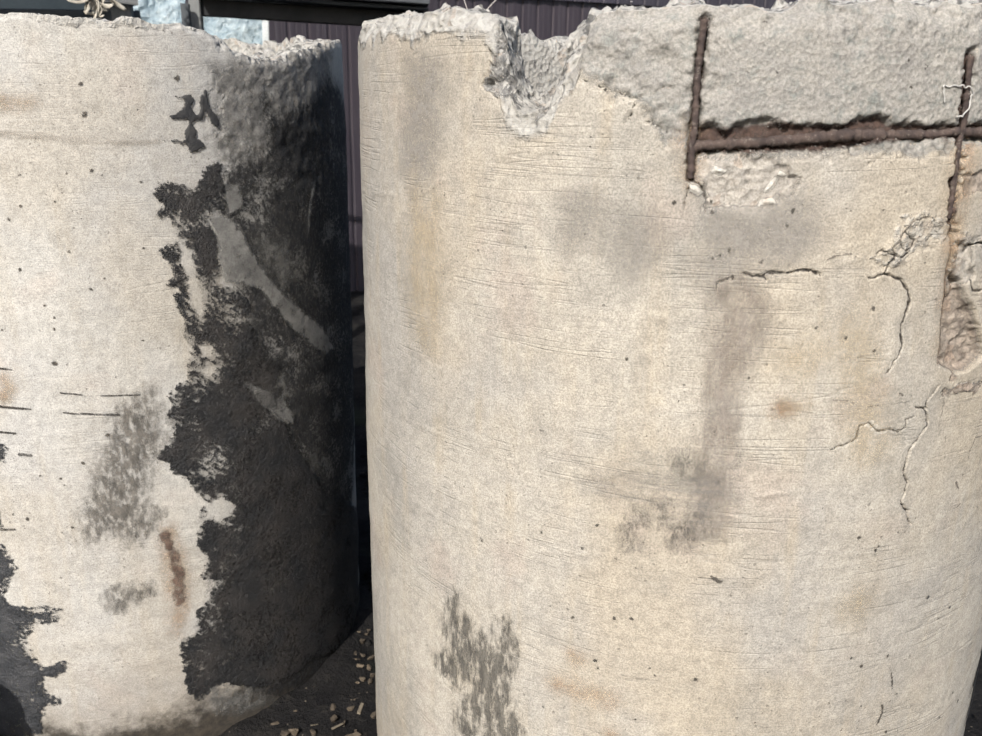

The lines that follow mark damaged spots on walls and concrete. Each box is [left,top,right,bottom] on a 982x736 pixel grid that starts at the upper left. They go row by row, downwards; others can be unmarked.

spalling [486,22,517,97]
spalling [579,0,982,214]
crack [716,253,852,286]
crack [868,218,946,373]
spalling [936,242,982,395]
crack [830,393,946,521]
corrosion [159,531,186,606]